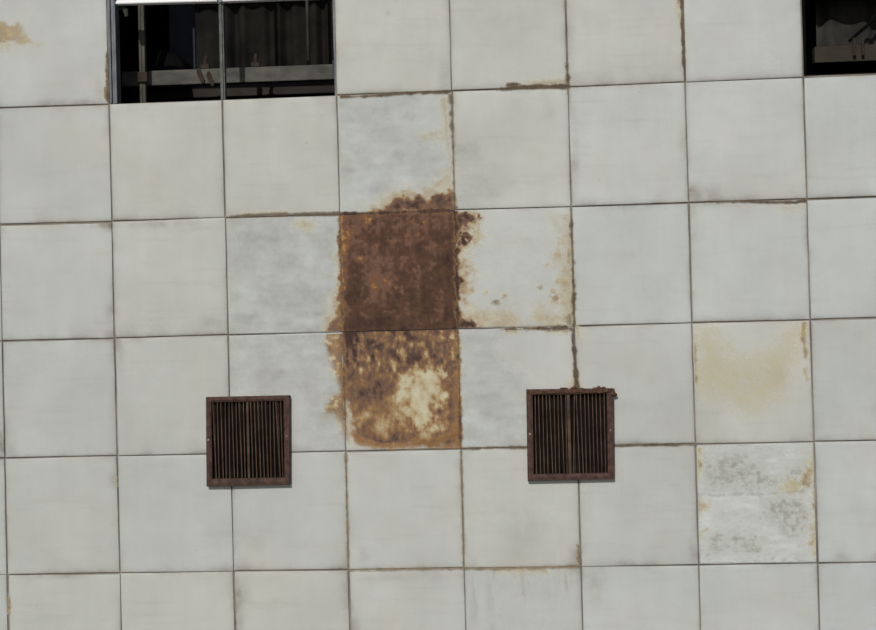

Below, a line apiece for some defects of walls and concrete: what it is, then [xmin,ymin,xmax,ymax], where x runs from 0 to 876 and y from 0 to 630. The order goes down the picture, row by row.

rust [677,0,685,67]
rust [496,64,571,91]
rust [340,90,454,148]
rust [230,161,615,571]